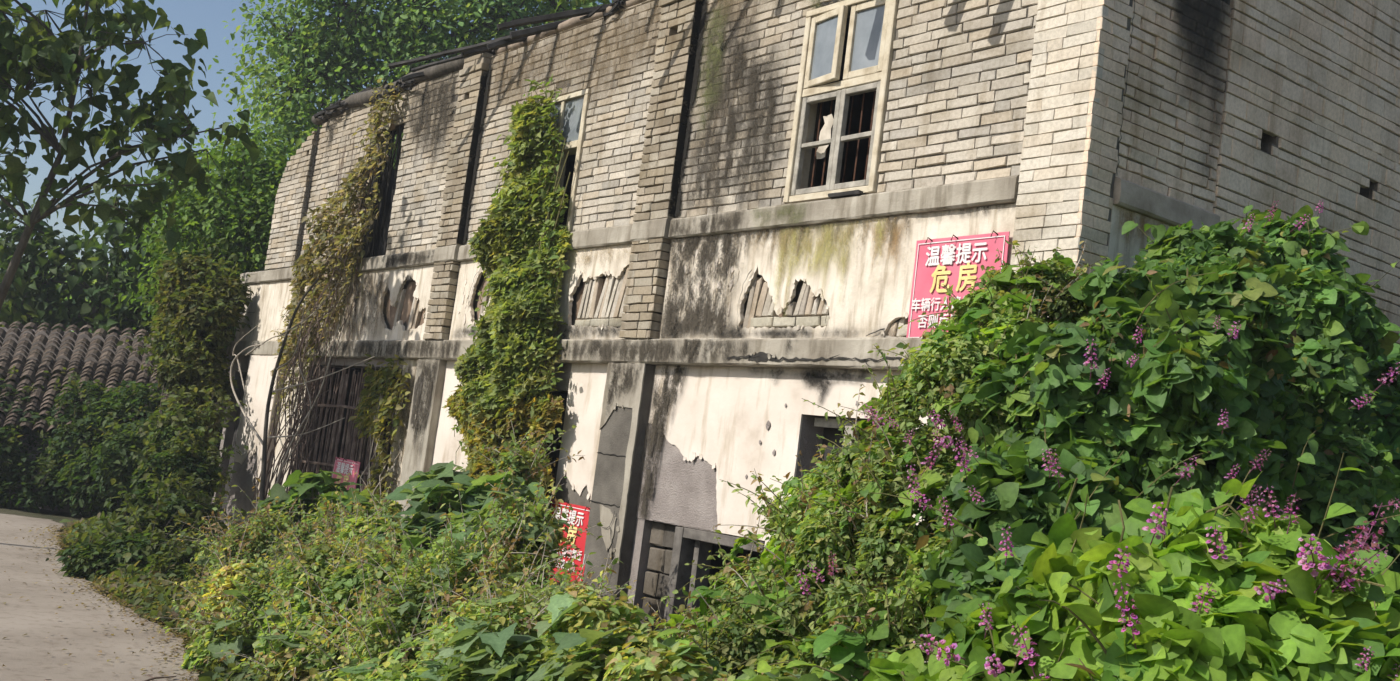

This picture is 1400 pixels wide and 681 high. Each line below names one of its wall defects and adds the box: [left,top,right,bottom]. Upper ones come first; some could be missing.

flaking render [346,275,426,336]
flaking render [567,262,632,330]
water stain [548,0,907,518]
flaking render [673,239,830,331]
flaking render [556,363,717,564]